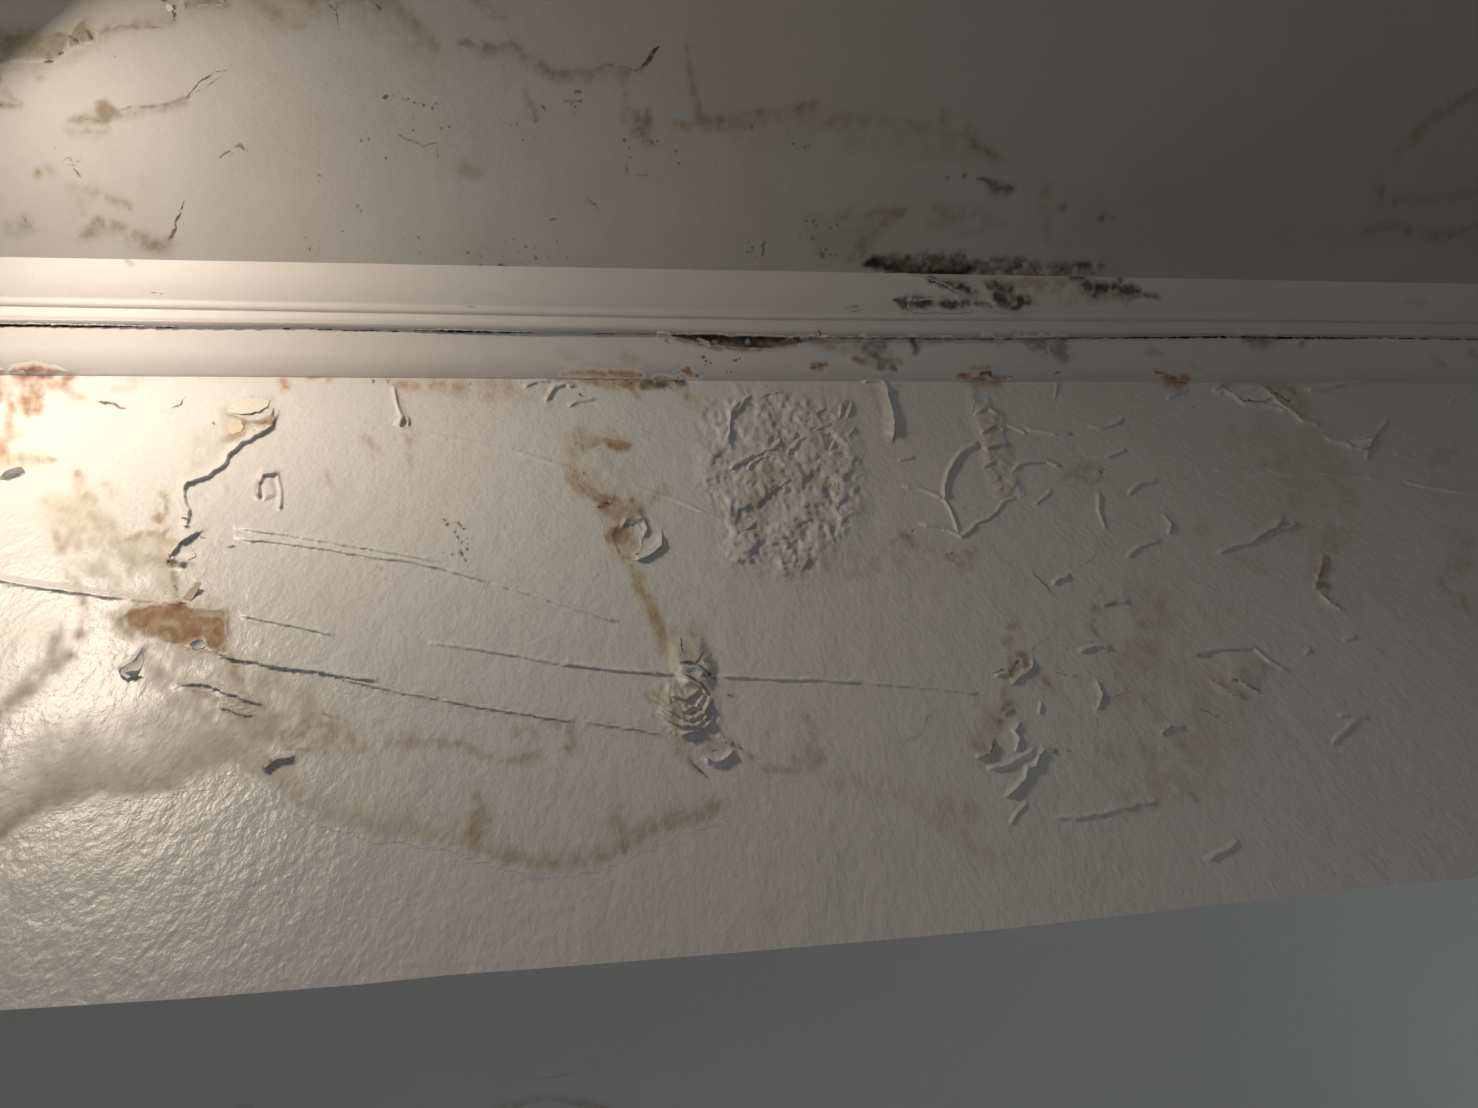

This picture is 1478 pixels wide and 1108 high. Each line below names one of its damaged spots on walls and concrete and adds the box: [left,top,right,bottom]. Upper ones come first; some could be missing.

crack [0,71,26,114]
spalling [0,7,110,88]
crack [86,8,181,59]
crack [59,69,228,260]
leakage [0,0,1478,369]
leakage [673,332,955,376]
spalling [100,389,284,680]
leakage [0,461,1025,882]
leakage [1076,569,1267,825]